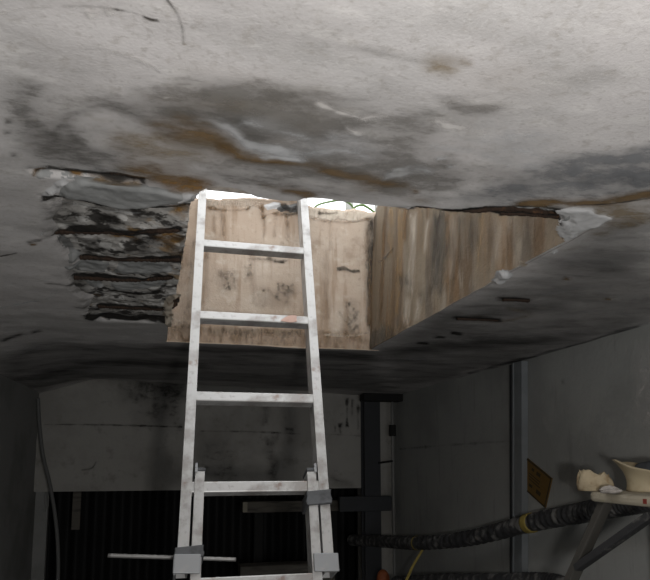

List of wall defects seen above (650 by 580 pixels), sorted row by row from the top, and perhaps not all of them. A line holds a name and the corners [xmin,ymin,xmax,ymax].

leakage [155,85,459,195]
spalling [32,166,145,186]
leakage [535,148,650,196]
flaking render [401,205,616,241]
rust [517,191,650,228]
spalling [42,195,191,327]
leakage [366,219,392,346]